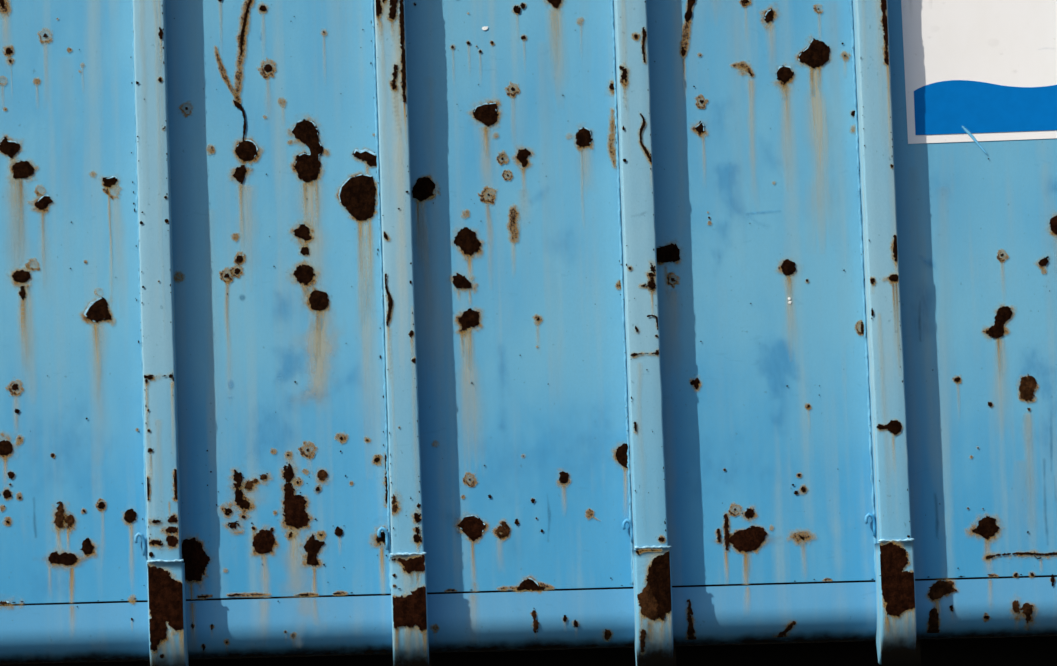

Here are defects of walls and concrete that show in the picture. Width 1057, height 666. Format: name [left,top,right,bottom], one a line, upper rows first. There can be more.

corrosion [240,0,251,55]
corrosion [258,58,276,79]
corrosion [775,38,851,139]
corrosion [287,118,329,245]
corrosion [336,149,384,256]
corrosion [81,291,113,346]
corrosion [982,304,1014,352]
corrosion [123,469,212,629]
corrosion [207,441,328,597]
corrosion [715,503,773,589]
corrosion [227,592,279,602]